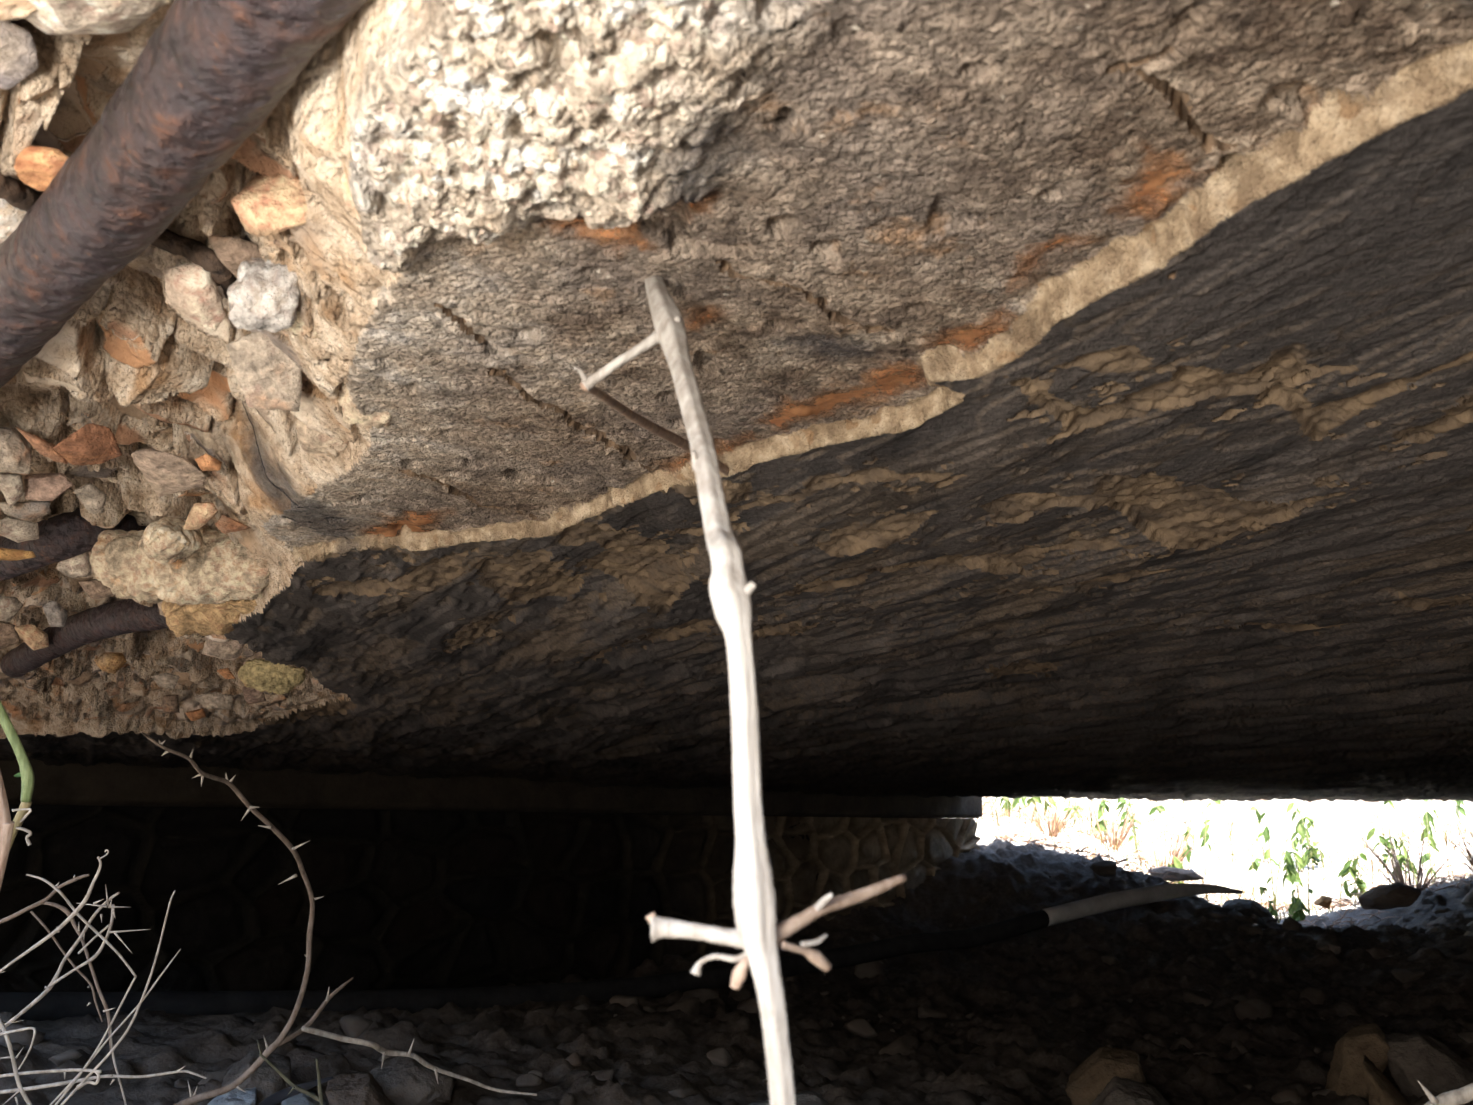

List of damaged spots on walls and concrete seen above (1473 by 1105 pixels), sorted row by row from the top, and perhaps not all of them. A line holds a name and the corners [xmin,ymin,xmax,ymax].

crack [1105,46,1238,153]
crack [433,303,656,472]
peeling [0,0,1473,740]
corrosion [759,366,924,428]
corrosion [933,312,1005,350]